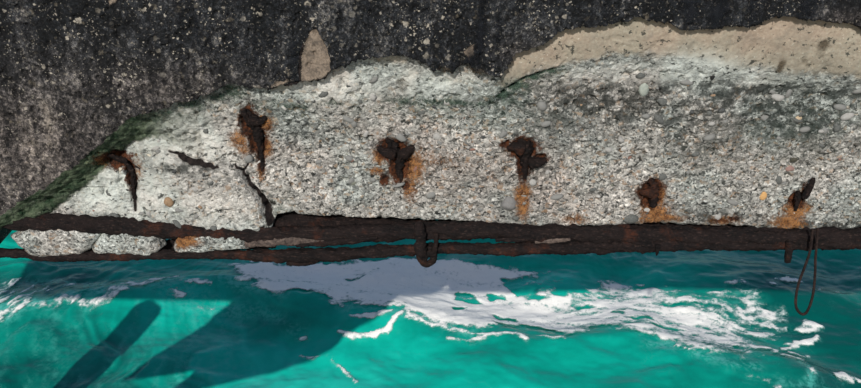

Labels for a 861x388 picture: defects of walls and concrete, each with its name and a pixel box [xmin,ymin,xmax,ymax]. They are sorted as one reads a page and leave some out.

corrosion [96,149,141,192]
crack [168,150,275,226]
corrosion [230,100,273,179]
corrosion [370,138,446,198]
spalling [0,16,861,231]
corrosion [499,135,550,218]
corrosion [634,175,683,223]
corrosion [770,182,810,229]
corrosion [160,236,198,250]
corrosion [232,237,324,250]